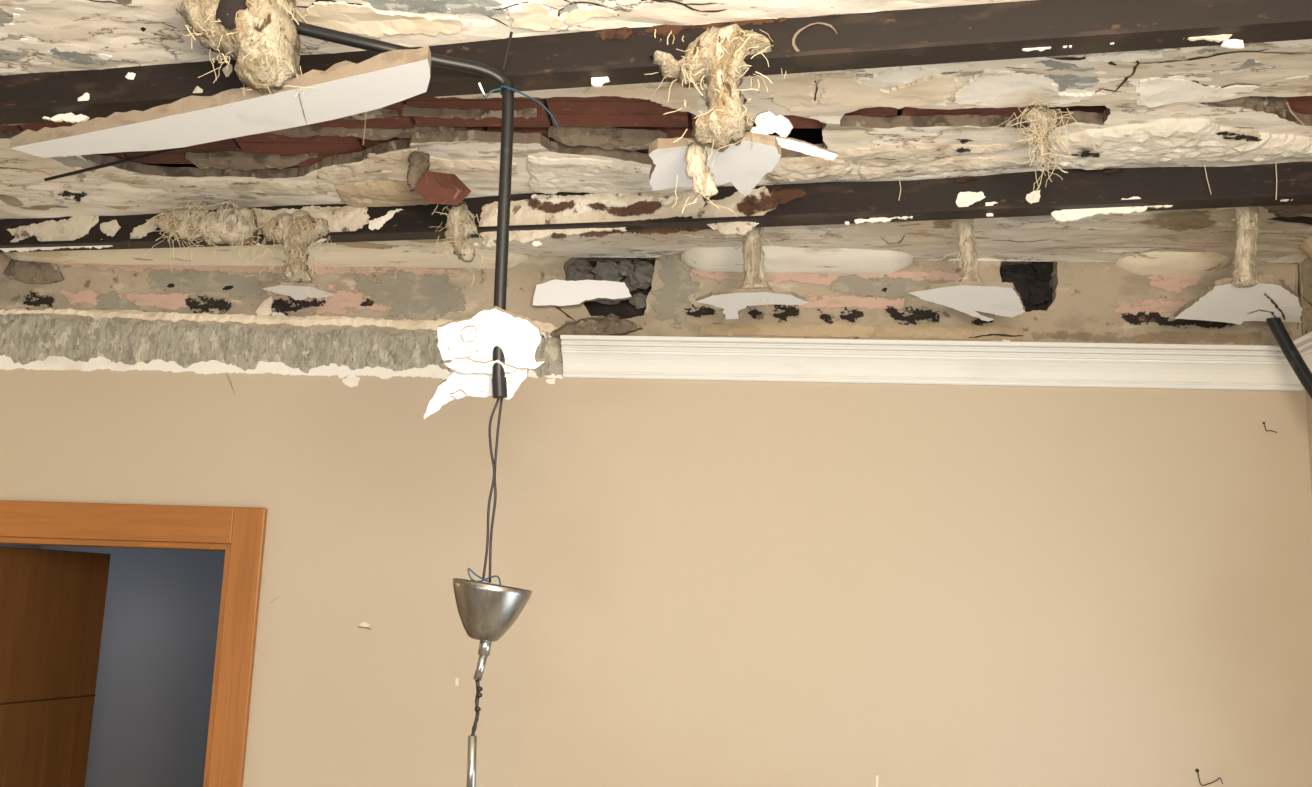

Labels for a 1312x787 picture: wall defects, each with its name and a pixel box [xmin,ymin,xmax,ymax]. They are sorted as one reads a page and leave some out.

peeling [0,8,30,61]
peeling [48,47,122,65]
peeling [303,0,617,38]
peeling [750,39,1312,128]
spalling [0,119,91,131]
spalling [49,82,706,173]
peeling [336,239,449,249]
spalling [1267,216,1312,225]
spalling [566,258,654,319]
spalling [1000,262,1053,312]